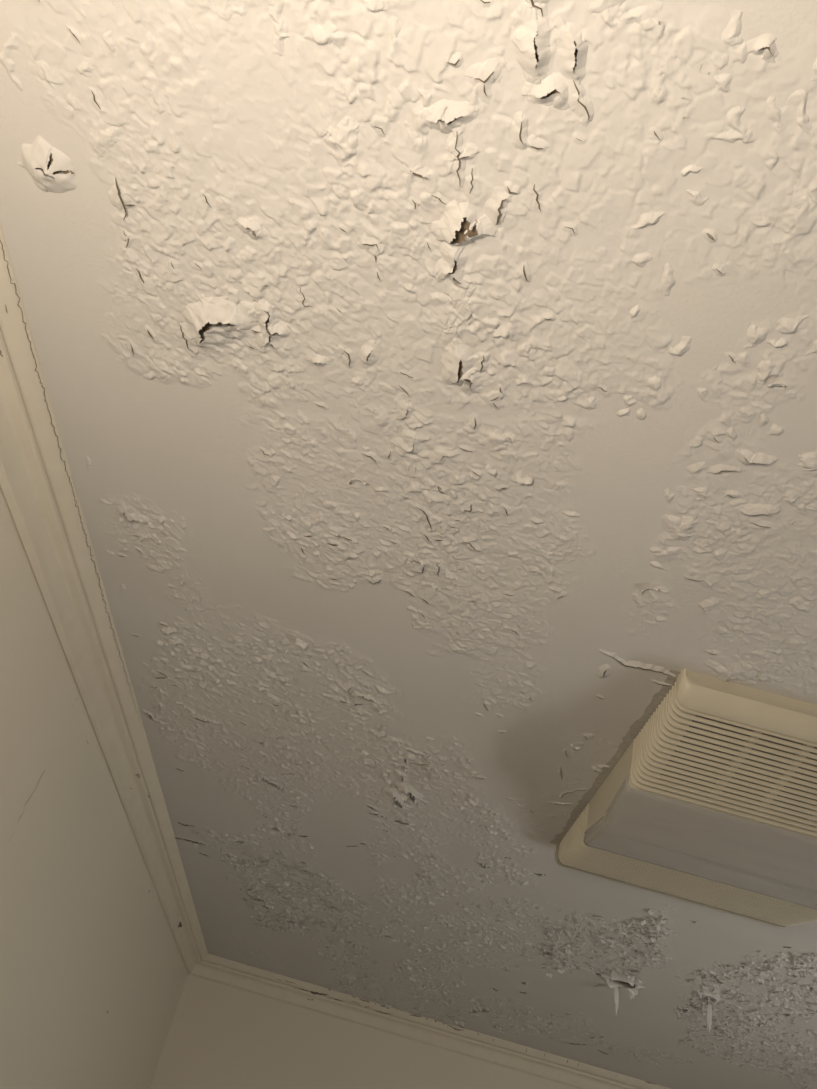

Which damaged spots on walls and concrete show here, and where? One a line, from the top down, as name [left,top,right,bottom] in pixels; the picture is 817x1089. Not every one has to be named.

peeling [510,5,588,110]
peeling [746,33,779,63]
peeling [426,99,479,134]
peeling [17,135,77,193]
peeling [232,216,270,240]
peeling [426,199,503,290]
peeling [183,294,291,357]
peeling [440,341,484,396]
peeling [391,398,461,466]
peeling [735,449,779,467]
peeling [365,755,425,826]
peeling [592,971,645,1014]